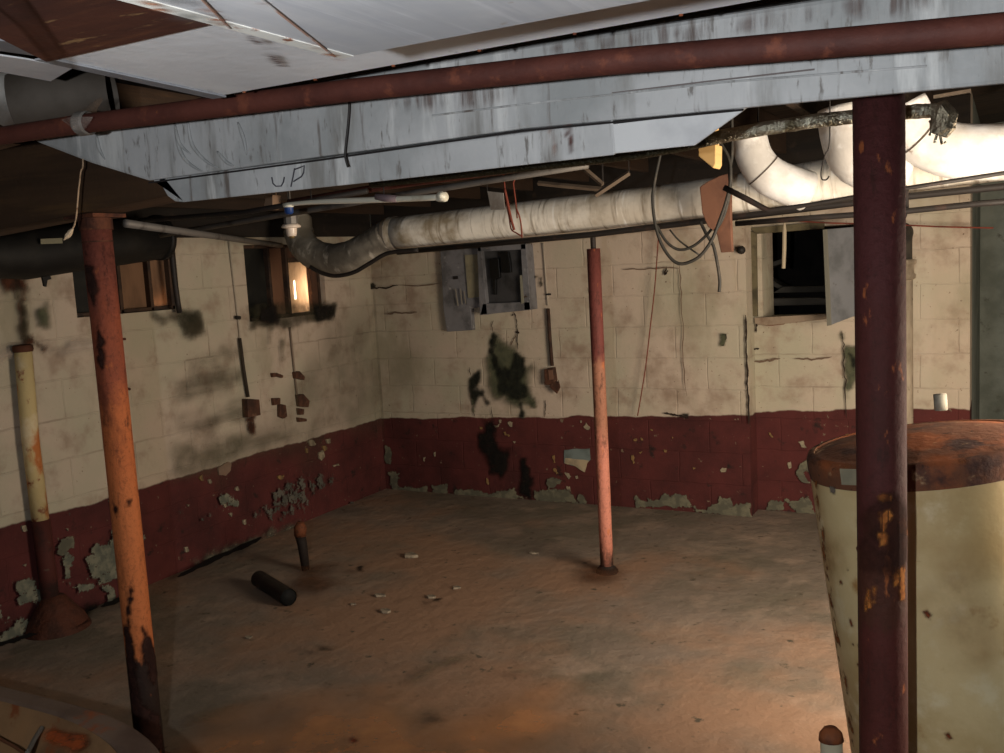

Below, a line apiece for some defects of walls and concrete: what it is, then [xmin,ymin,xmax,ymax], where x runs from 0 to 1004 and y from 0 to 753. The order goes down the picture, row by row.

water stain [469,333,536,418]
water stain [841,332,855,419]
peeling [546,448,591,491]
peeling [788,460,811,484]
corrosion [806,433,856,578]
corrosion [907,450,1004,492]
peeling [0,564,41,642]
peeling [56,528,117,602]